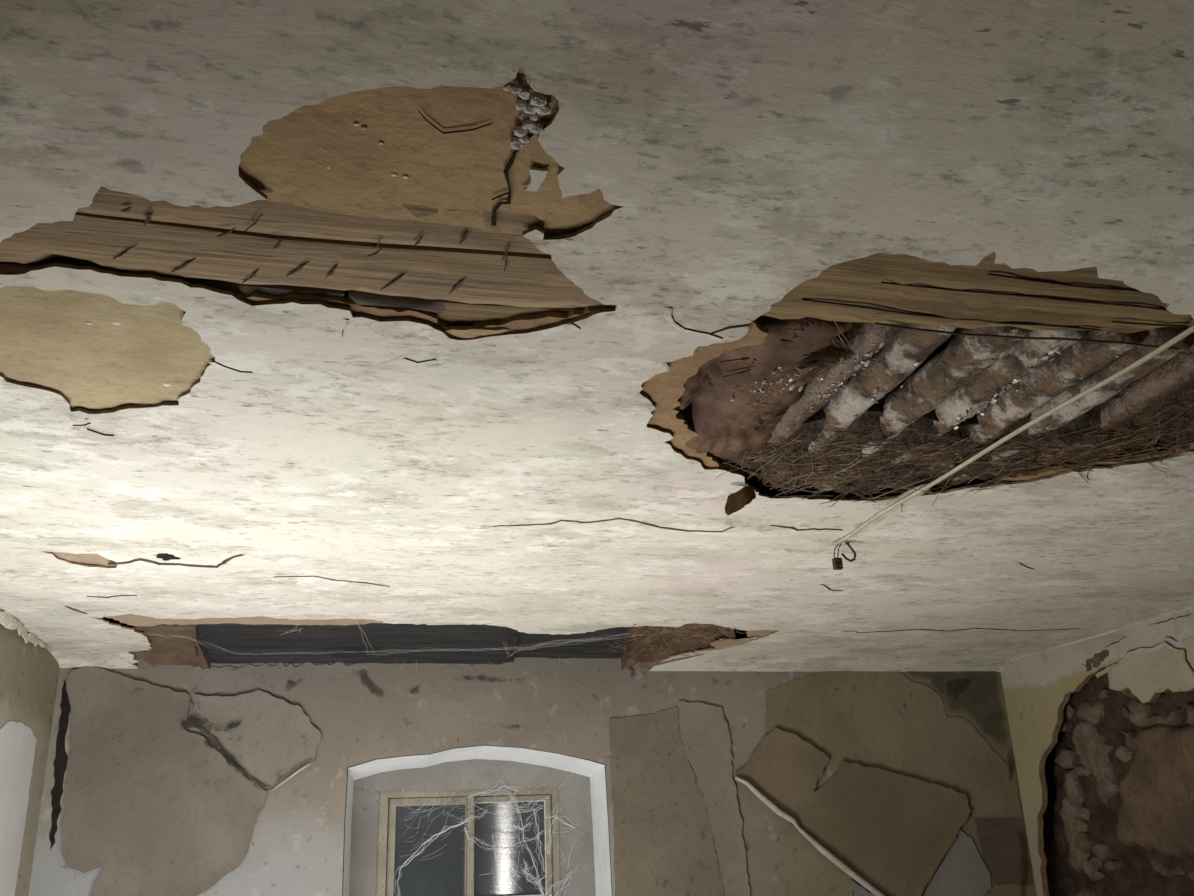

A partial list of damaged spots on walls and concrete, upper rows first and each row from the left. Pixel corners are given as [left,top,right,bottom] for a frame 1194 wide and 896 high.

flaking render [239,67,616,236]
flaking render [237,292,616,338]
flaking render [0,286,215,411]
flaking render [641,315,856,473]
crack [493,518,735,532]
flaking render [724,485,756,516]
crack [769,524,843,532]
flaking render [106,614,383,669]
crack [843,626,1079,634]
crack [1096,613,1194,678]
spalling [974,637,1194,896]
flaking render [0,721,37,896]